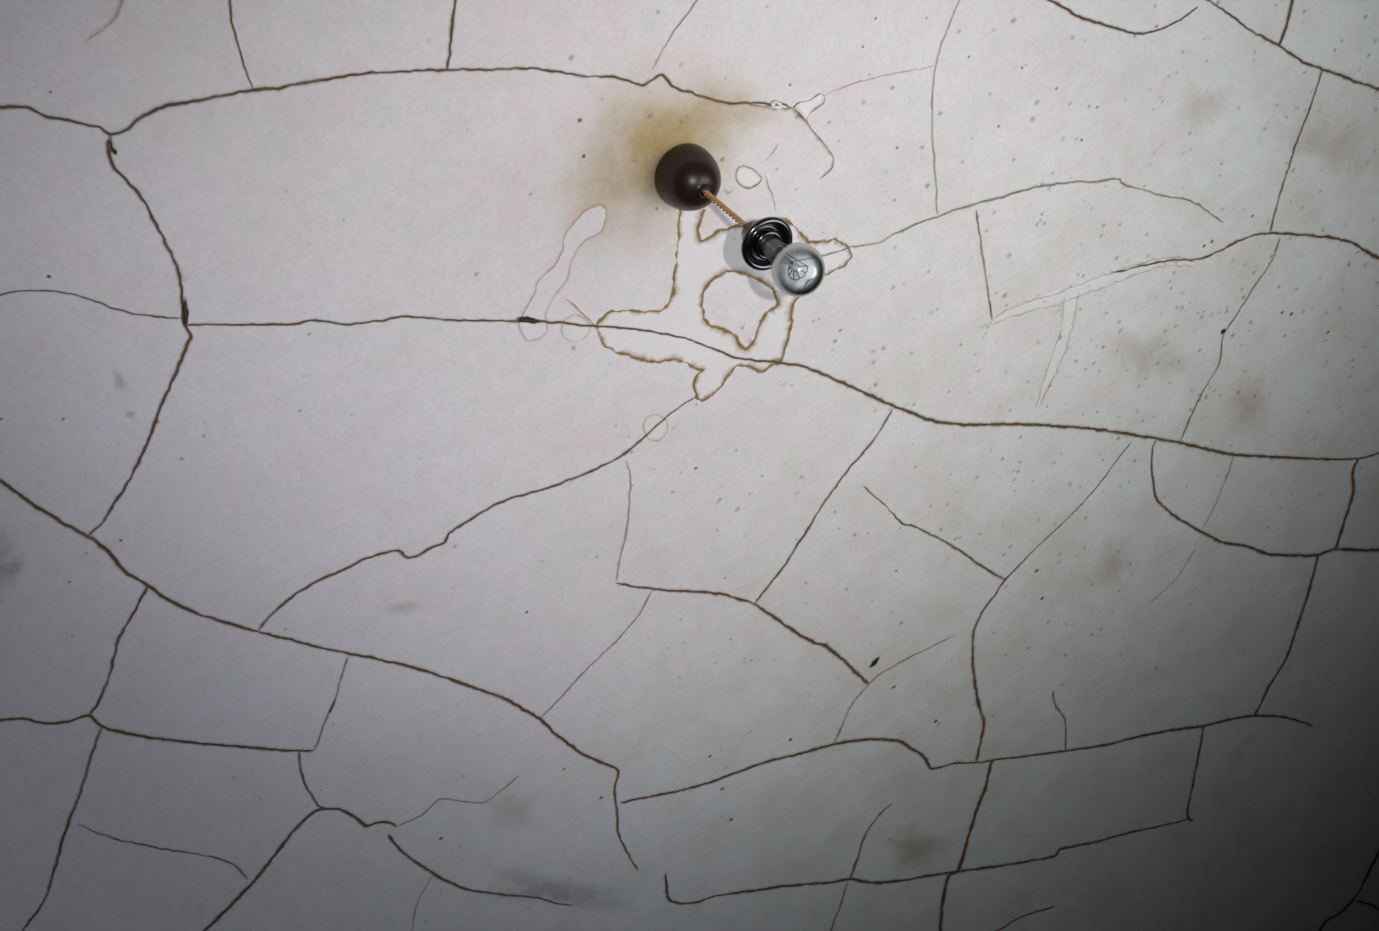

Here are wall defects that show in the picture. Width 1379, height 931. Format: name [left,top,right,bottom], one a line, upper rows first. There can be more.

crack [0,0,791,931]
crack [537,0,1379,931]